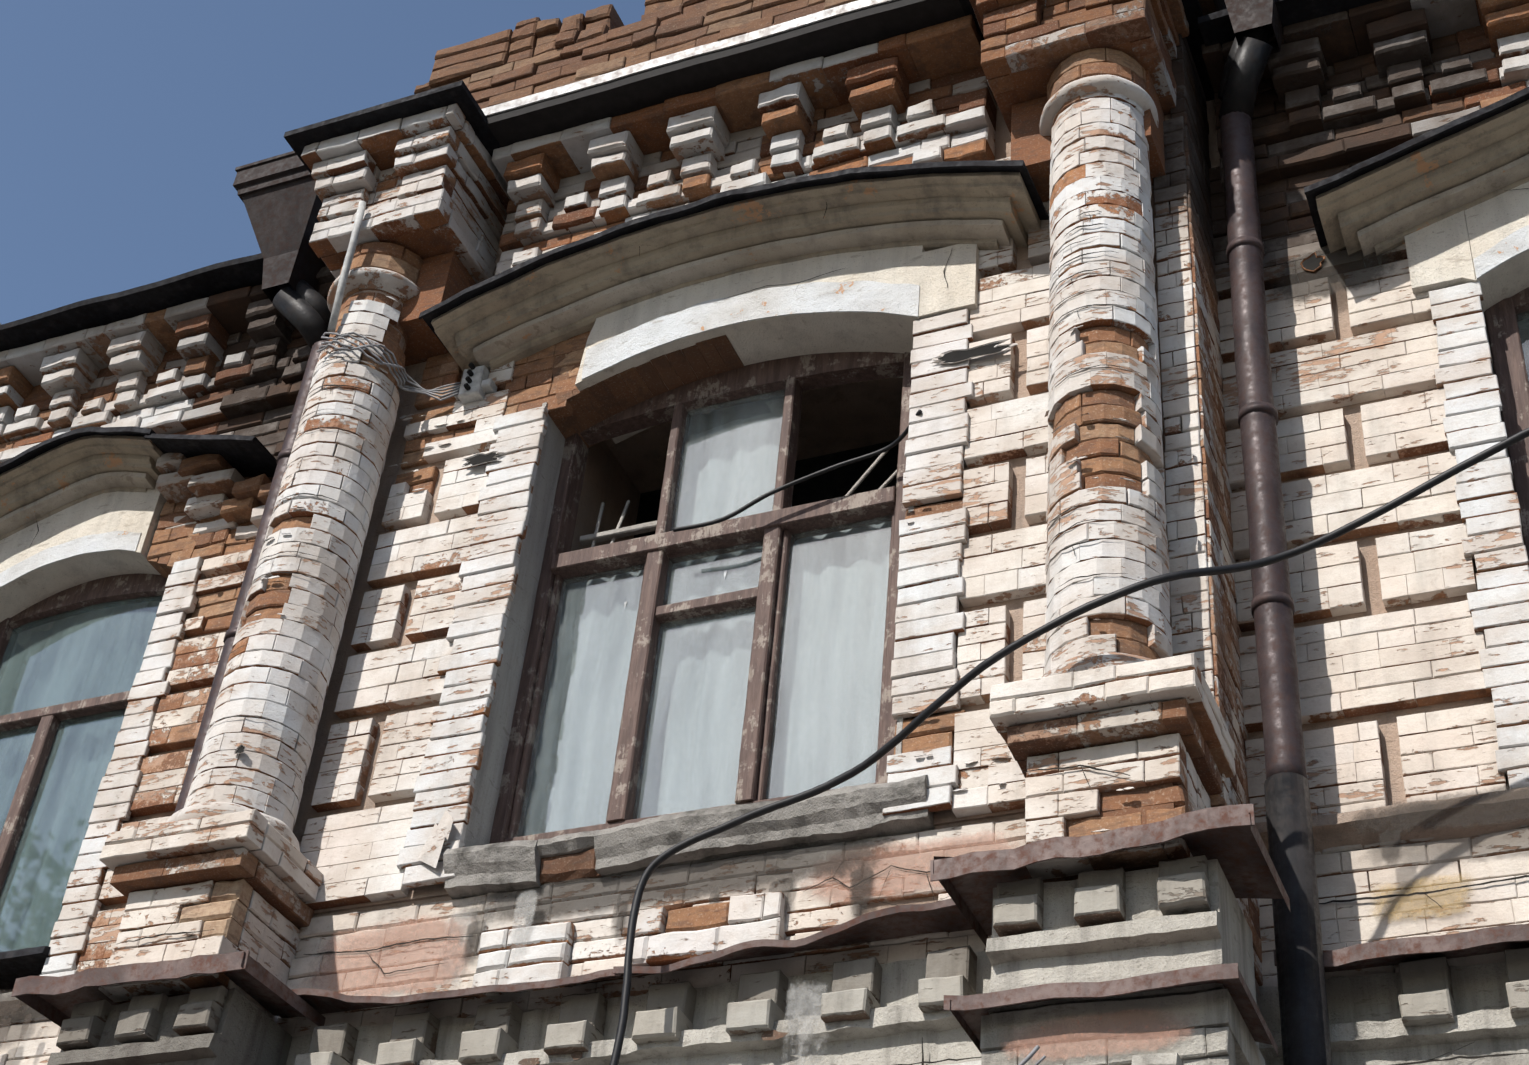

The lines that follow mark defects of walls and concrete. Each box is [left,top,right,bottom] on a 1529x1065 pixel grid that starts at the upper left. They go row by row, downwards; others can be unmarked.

spalling [321,288,408,390]
spalling [1069,325,1158,376]
spalling [389,353,475,496]
spalling [1045,383,1162,492]
spalling [147,453,313,578]
spalling [191,575,292,634]
spalling [1090,618,1163,660]